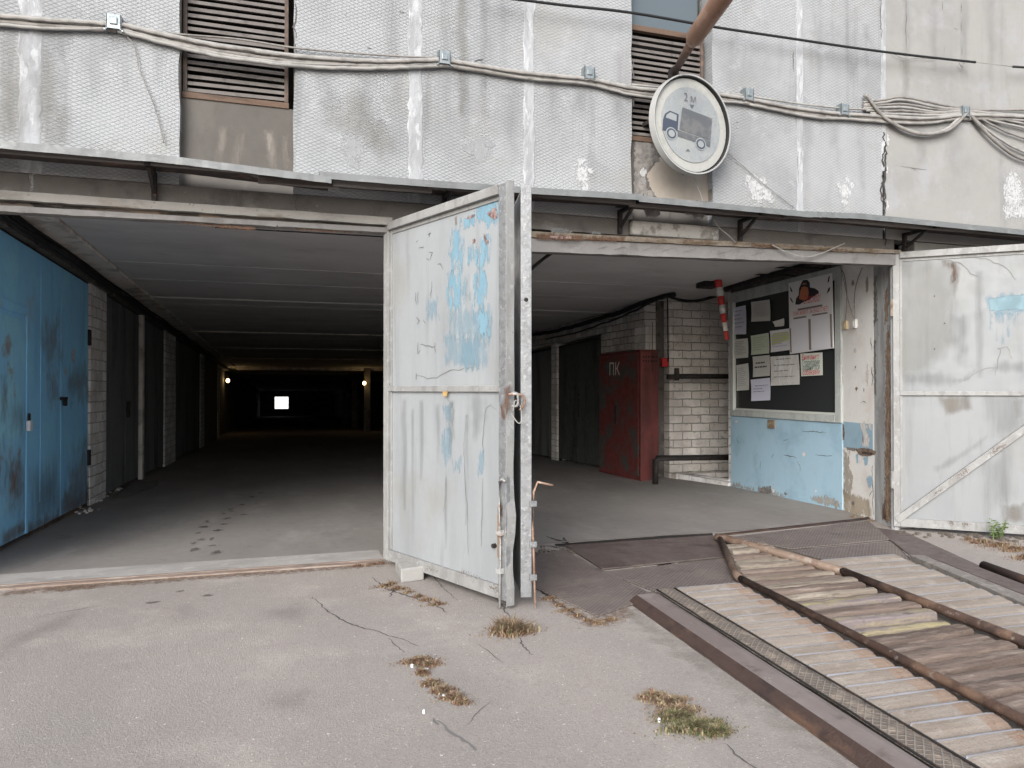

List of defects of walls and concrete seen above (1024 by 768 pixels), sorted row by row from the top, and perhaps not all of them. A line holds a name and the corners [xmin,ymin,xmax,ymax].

spalling [631,32,696,85]
peeling [632,96,708,219]
crack [880,132,926,246]
peeling [446,201,499,338]
rust [537,234,623,242]
flaking render [812,421,876,517]
crack [312,597,418,652]